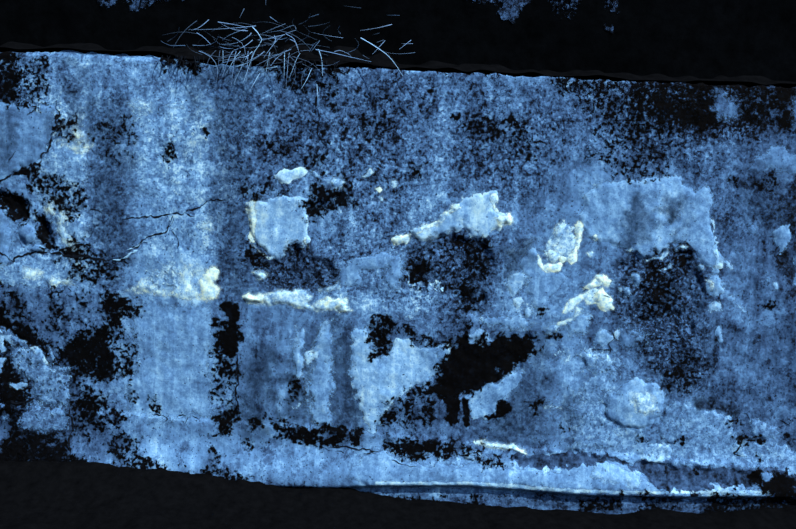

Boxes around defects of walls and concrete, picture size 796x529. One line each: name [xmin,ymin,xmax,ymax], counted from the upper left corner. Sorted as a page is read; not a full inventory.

crack [0,101,61,182]
damp [21,162,89,223]
damp [753,170,779,193]
crack [0,199,225,272]
spalling [238,146,566,347]
damp [538,220,594,273]
damp [646,245,688,271]
peeling [290,318,338,429]
damp [0,232,641,484]
peeling [348,175,796,498]
damp [362,489,485,505]